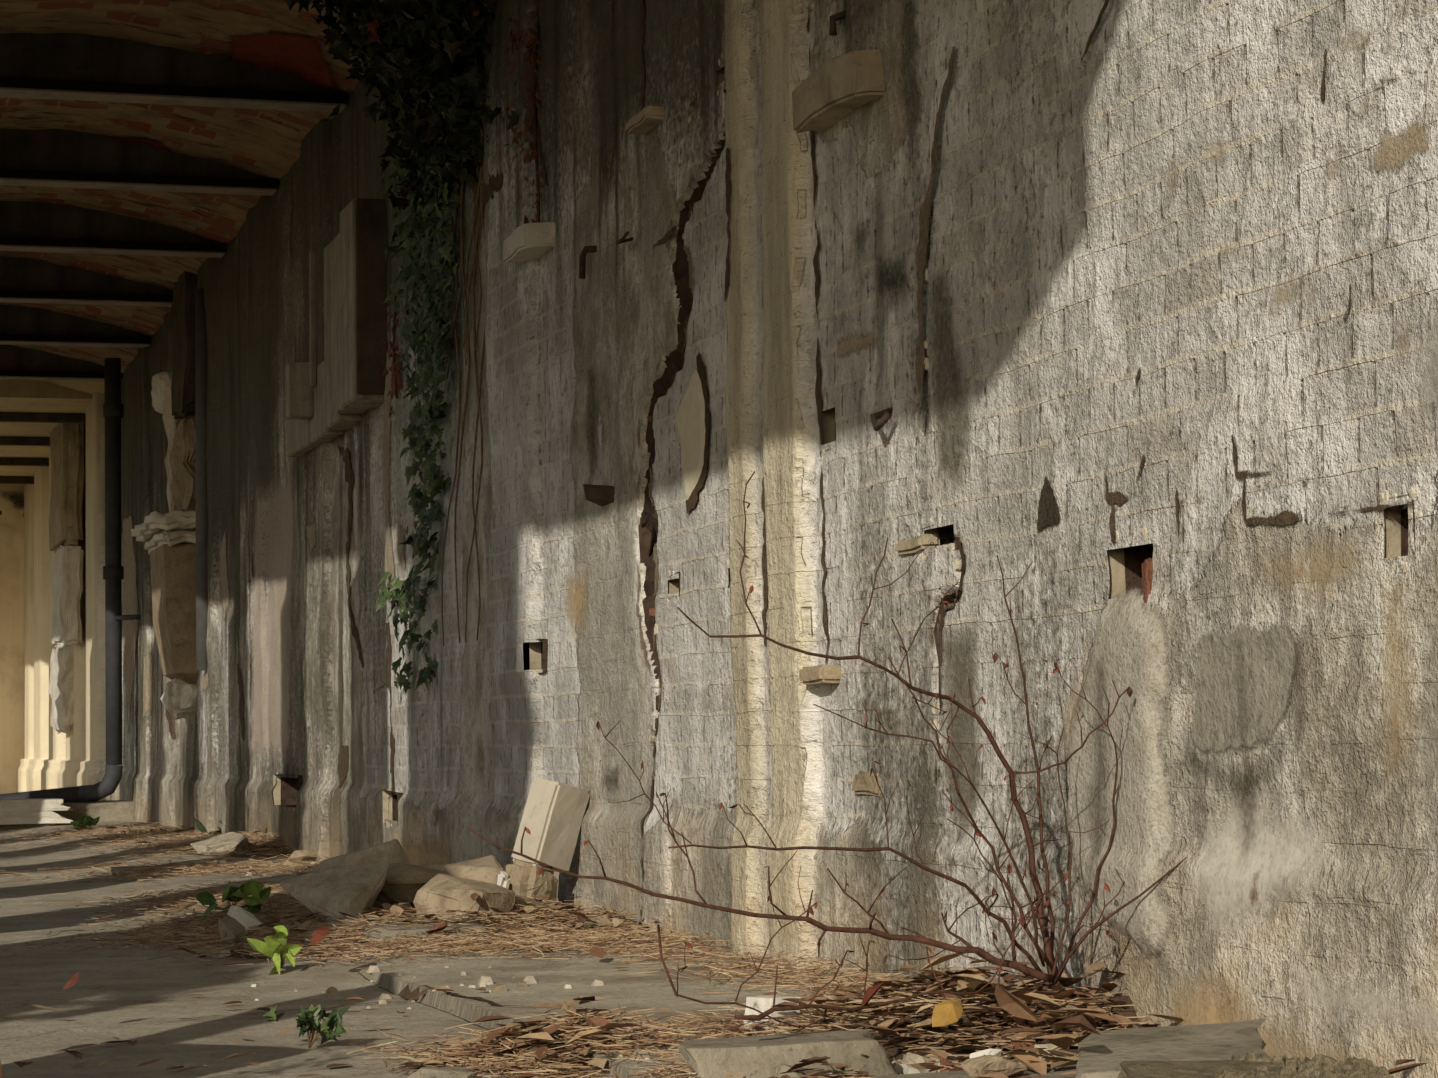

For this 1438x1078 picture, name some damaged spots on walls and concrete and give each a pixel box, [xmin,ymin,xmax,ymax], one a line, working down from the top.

crack [1080,0,1109,64]
crack [915,47,956,432]
crack [636,79,731,925]
peeling [675,352,710,514]
crack [928,542,966,784]